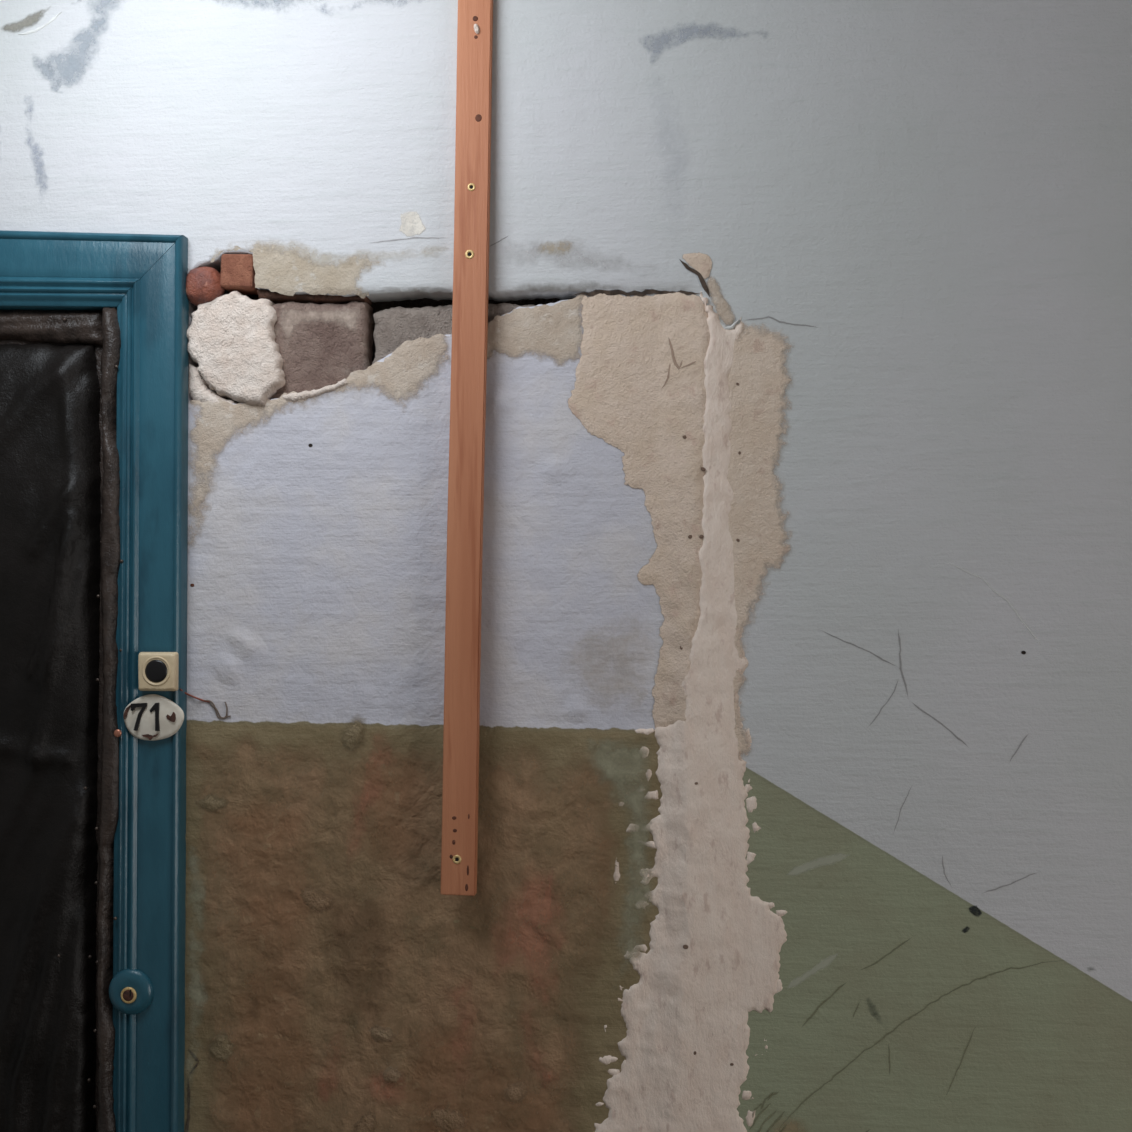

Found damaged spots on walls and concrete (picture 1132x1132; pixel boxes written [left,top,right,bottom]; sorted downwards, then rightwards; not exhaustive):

damp [39,0,111,91]
crack [572,289,699,297]
spalling [188,244,453,544]
peeling [487,252,791,761]
crack [804,939,909,1025]
crack [779,961,1052,1130]